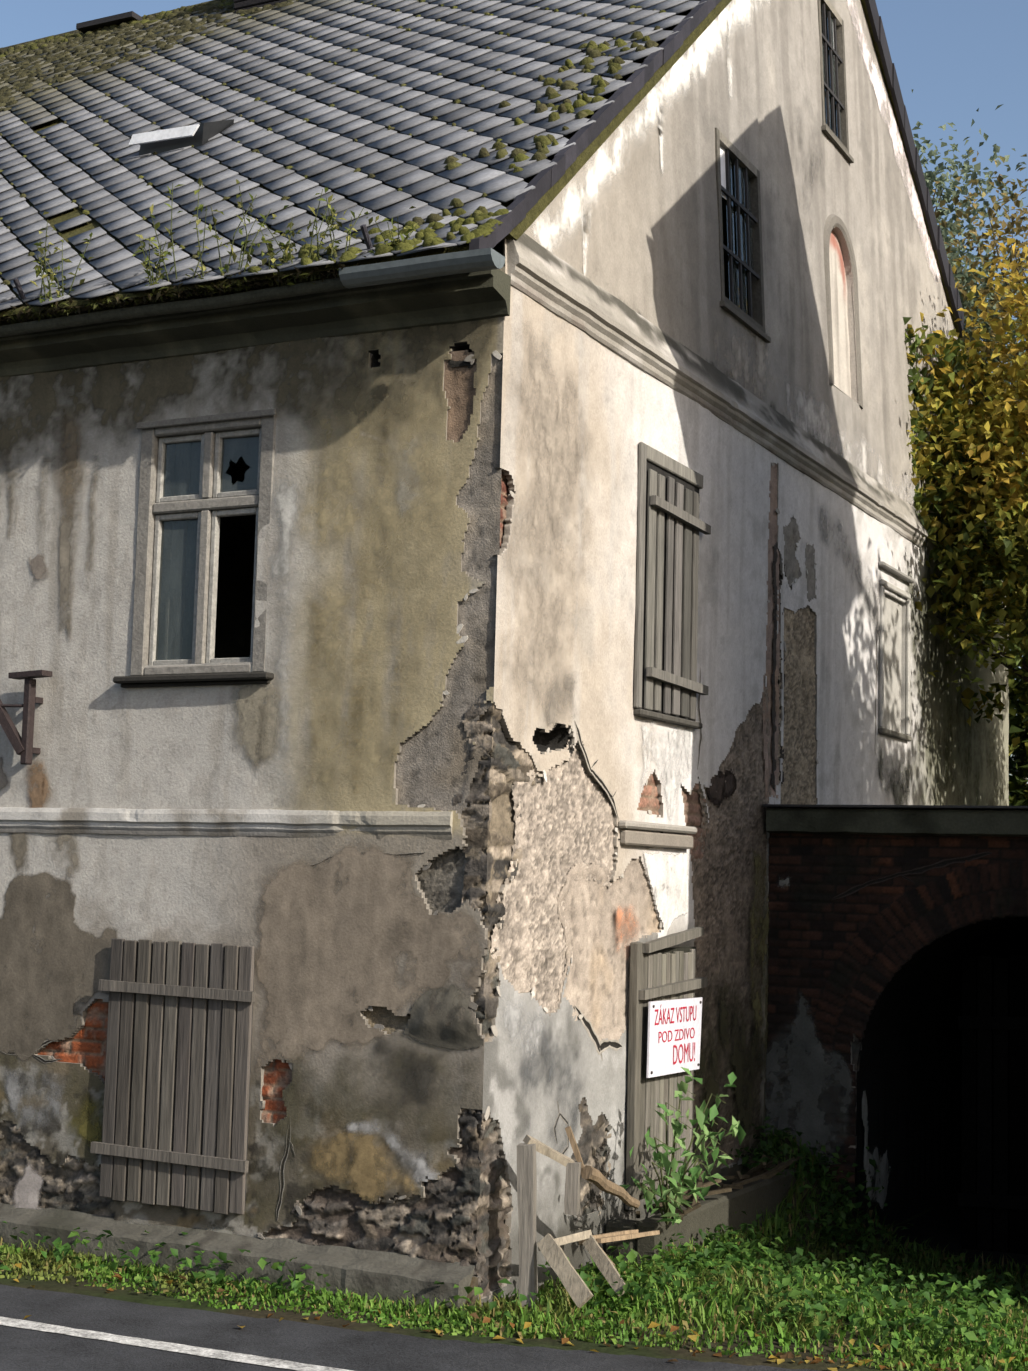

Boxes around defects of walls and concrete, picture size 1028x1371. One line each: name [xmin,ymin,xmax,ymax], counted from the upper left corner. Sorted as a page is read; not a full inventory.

damp [534,0,752,275]
damp [847,0,940,280]
damp [0,320,493,632]
flaking render [396,342,514,813]
flaking render [0,872,117,1081]
flaking render [261,1059,293,1124]
flaking render [364,1006,411,1034]
flaking render [490,723,663,1042]
flaking render [571,1098,612,1229]
flaking render [682,508,819,1167]